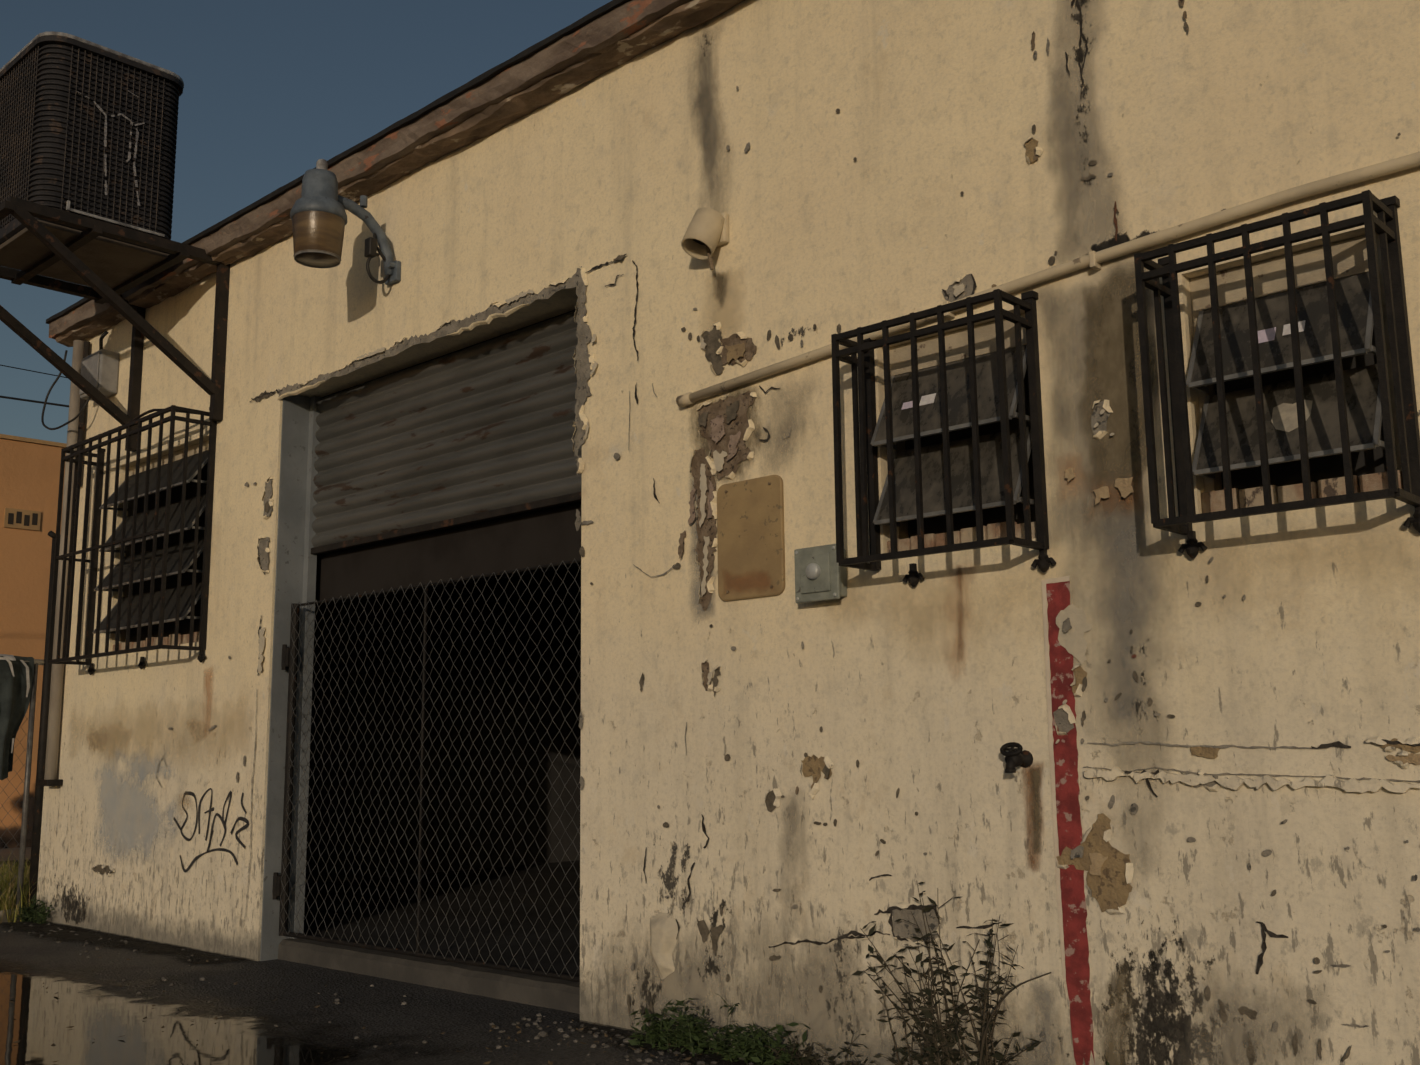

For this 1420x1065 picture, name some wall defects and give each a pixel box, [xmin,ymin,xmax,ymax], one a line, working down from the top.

crack [1065,0,1088,99]
water stain [1066,0,1157,255]
spalling [277,266,598,475]
crack [585,254,657,450]
spalling [681,322,817,375]
peeling [678,390,757,628]
water stain [653,836,694,917]
water stain [616,899,876,1055]
crack [768,930,890,948]
rust [1025,767,1041,868]
spalling [1056,795,1139,915]
water stain [1099,911,1262,1065]